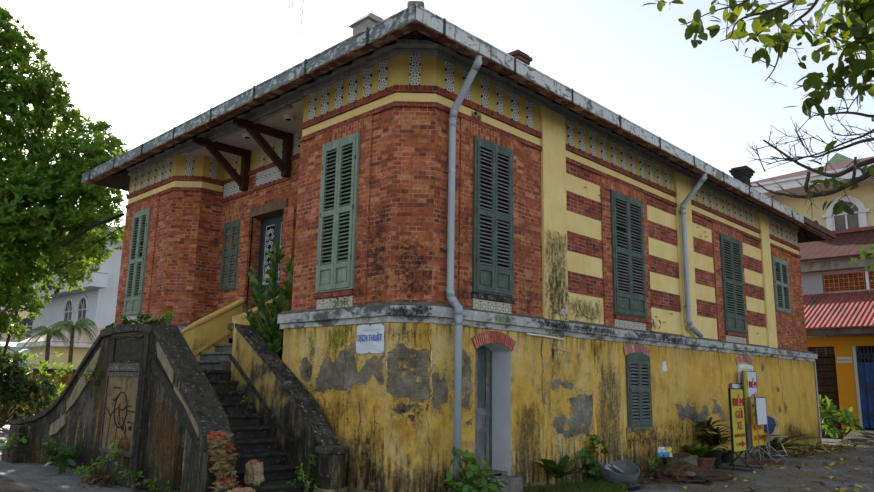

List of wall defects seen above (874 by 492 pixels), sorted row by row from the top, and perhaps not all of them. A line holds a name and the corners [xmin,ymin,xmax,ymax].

damp [522,232,616,355]
damp [351,430,380,483]
peeling [299,341,476,429]
peeling [542,377,593,440]
damp [600,366,712,459]
peeling [675,398,725,434]